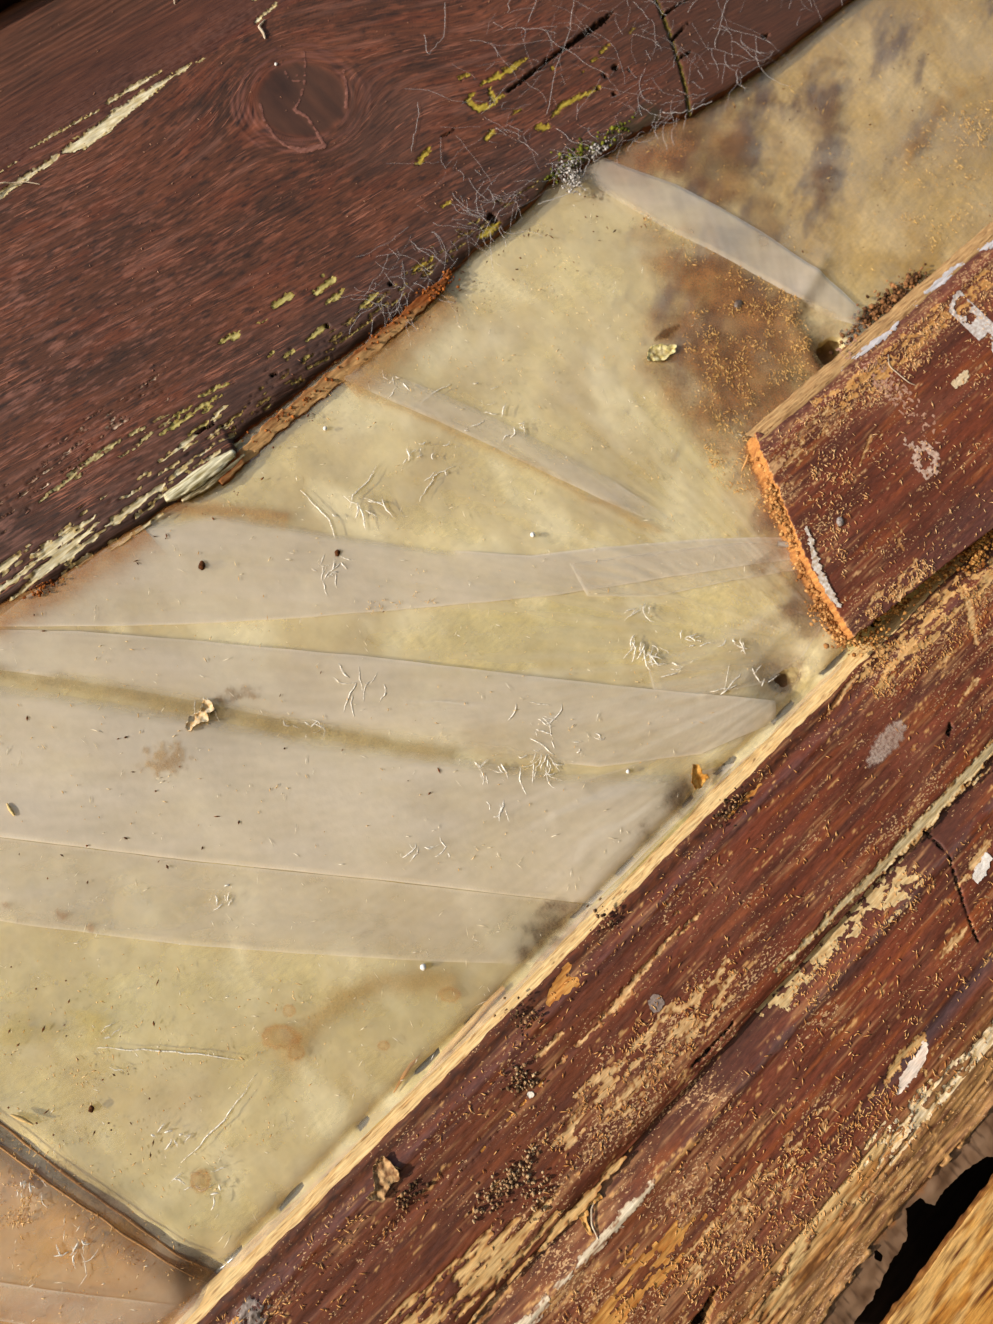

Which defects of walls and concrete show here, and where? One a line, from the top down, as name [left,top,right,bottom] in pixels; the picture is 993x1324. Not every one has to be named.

peeling [0,58,206,199]
crack [506,13,613,93]
crack [655,0,692,117]
water stain [657,254,821,449]
peeling [767,262,993,486]
peeling [0,382,271,601]
peeling [824,557,993,719]
peeling [755,739,993,1017]
peeling [533,910,701,1066]
peeling [384,955,738,1324]
peeling [589,1096,834,1324]
peeling [725,1021,993,1324]